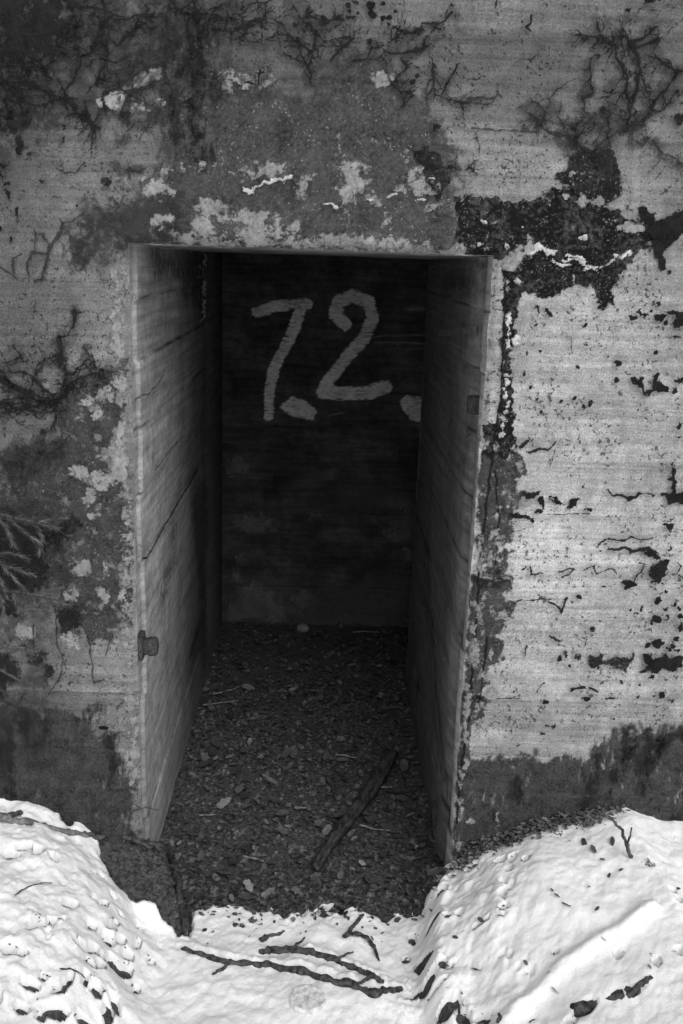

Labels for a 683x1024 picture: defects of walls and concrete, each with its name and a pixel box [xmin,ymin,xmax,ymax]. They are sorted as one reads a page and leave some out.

peeling [95,67,166,114]
peeling [218,69,276,94]
peeling [367,68,396,89]
peeling [104,134,460,254]
peeling [562,193,645,233]
spalling [502,226,632,285]
water stain [63,0,683,859]
water stain [0,358,134,642]
crack [516,536,683,656]
crack [570,680,605,693]
water stain [0,645,138,843]